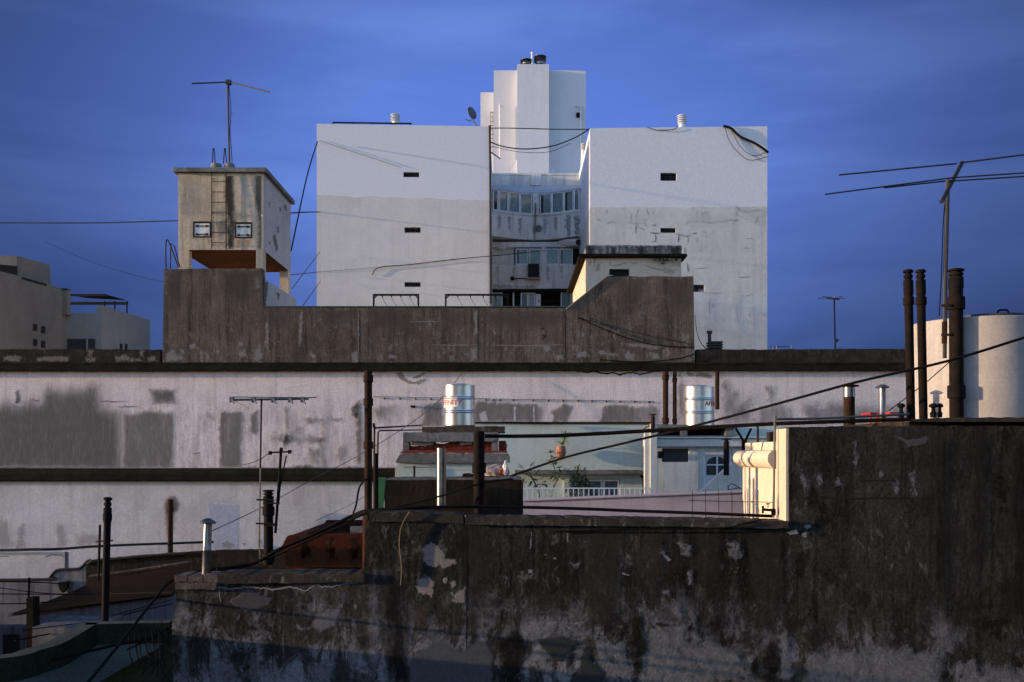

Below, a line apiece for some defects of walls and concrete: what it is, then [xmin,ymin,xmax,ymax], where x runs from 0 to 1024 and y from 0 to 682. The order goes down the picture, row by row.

crack [564,207,758,317]
leakage [0,384,175,468]
leakage [206,410,265,468]
peeling [415,542,466,603]